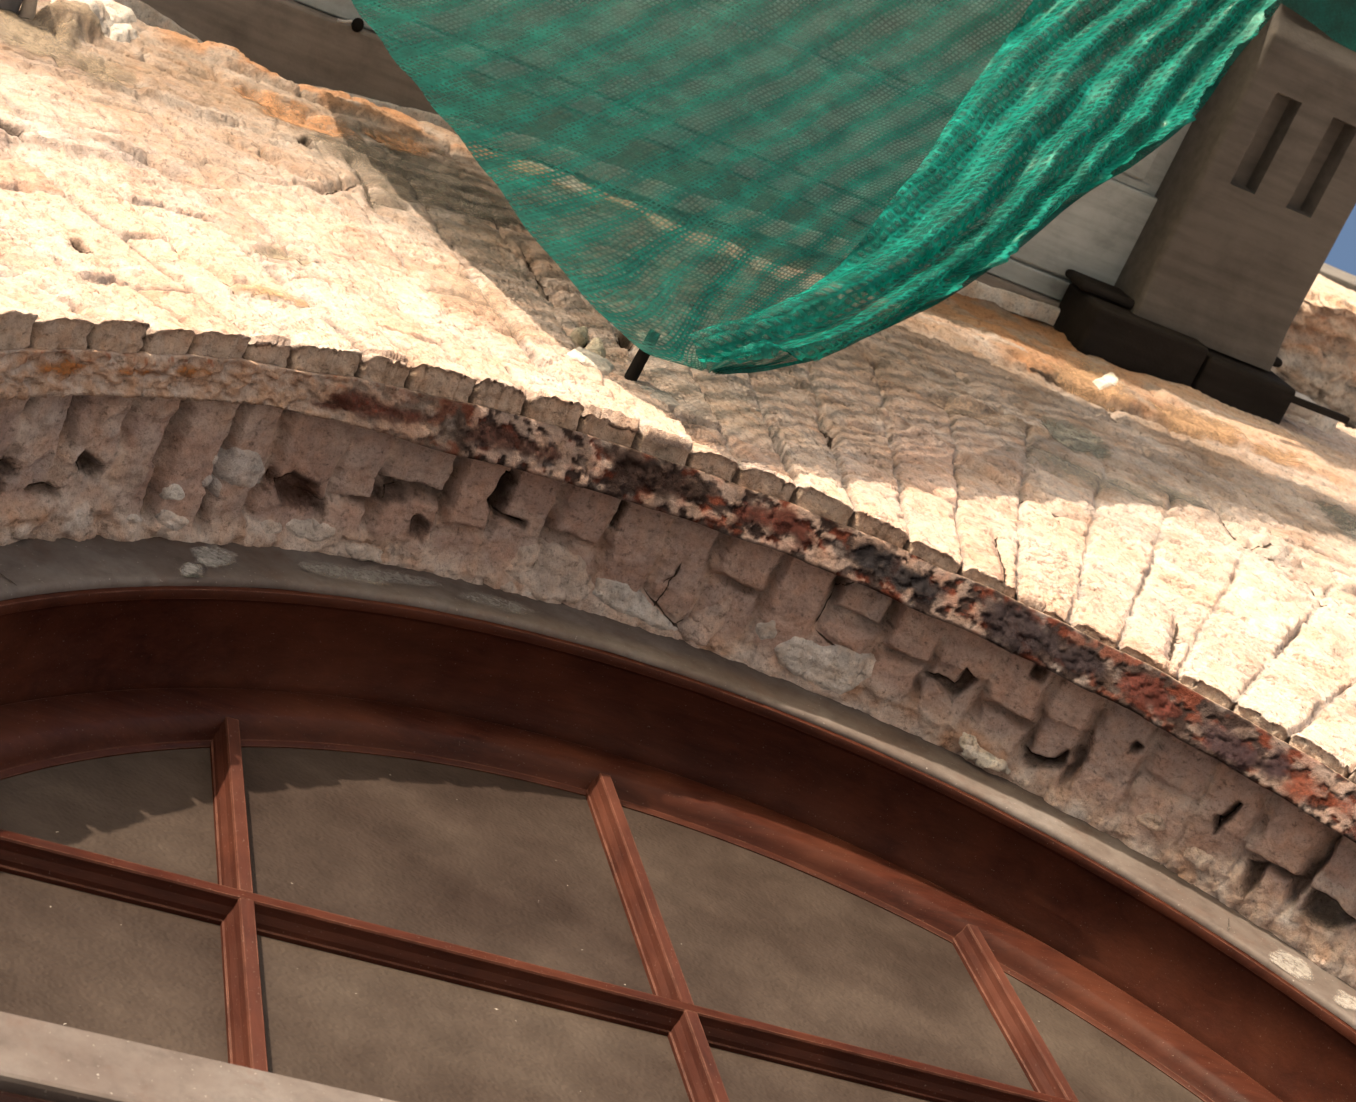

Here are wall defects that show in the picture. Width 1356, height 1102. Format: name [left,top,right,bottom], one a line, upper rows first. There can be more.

crack [326,173,378,208]
corrosion [315,388,431,424]
corrosion [465,424,562,461]
corrosion [597,446,713,500]
corrosion [735,503,813,545]
corrosion [851,545,944,602]
corrosion [982,598,1105,679]
corrosion [1201,722,1351,813]